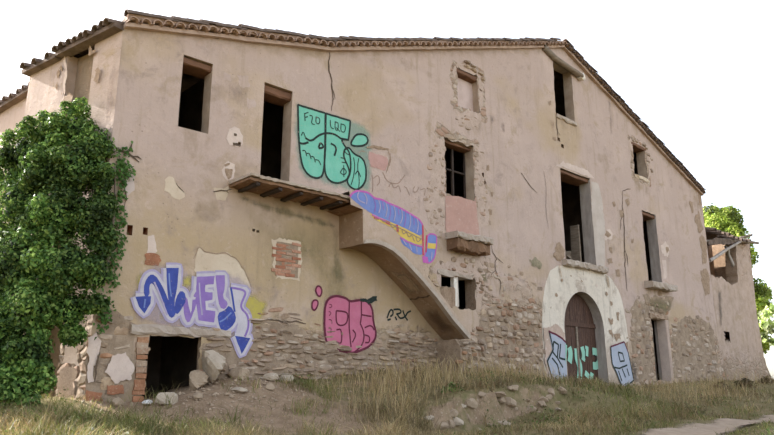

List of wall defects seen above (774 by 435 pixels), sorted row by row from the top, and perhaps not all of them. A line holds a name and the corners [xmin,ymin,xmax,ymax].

peeling [56,57,73,108]
flaking render [226,126,243,148]
crack [327,52,335,111]
peeling [452,60,485,130]
peeling [423,138,447,239]
peeling [472,144,493,228]
flaking render [271,238,302,281]
peeling [57,308,136,402]
peeling [429,251,565,377]
peeling [605,291,723,383]